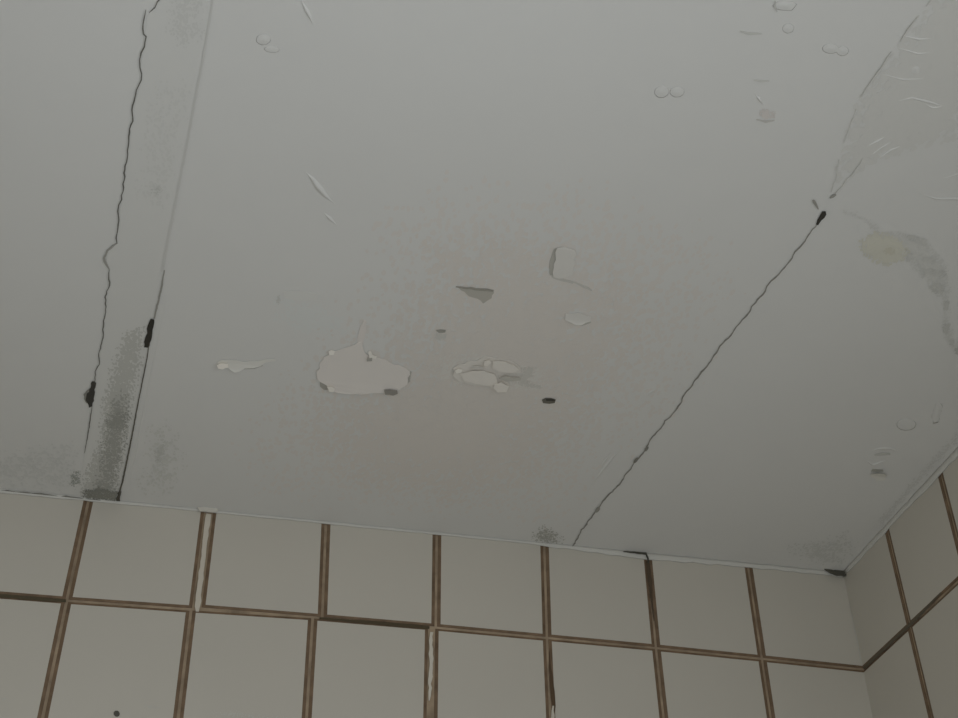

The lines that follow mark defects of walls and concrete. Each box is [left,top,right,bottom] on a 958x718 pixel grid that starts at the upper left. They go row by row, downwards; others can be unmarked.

crack [94,0,159,382]
crack [573,0,932,546]
water stain [0,326,146,501]
peeling [316,342,411,396]
peeling [453,356,521,392]